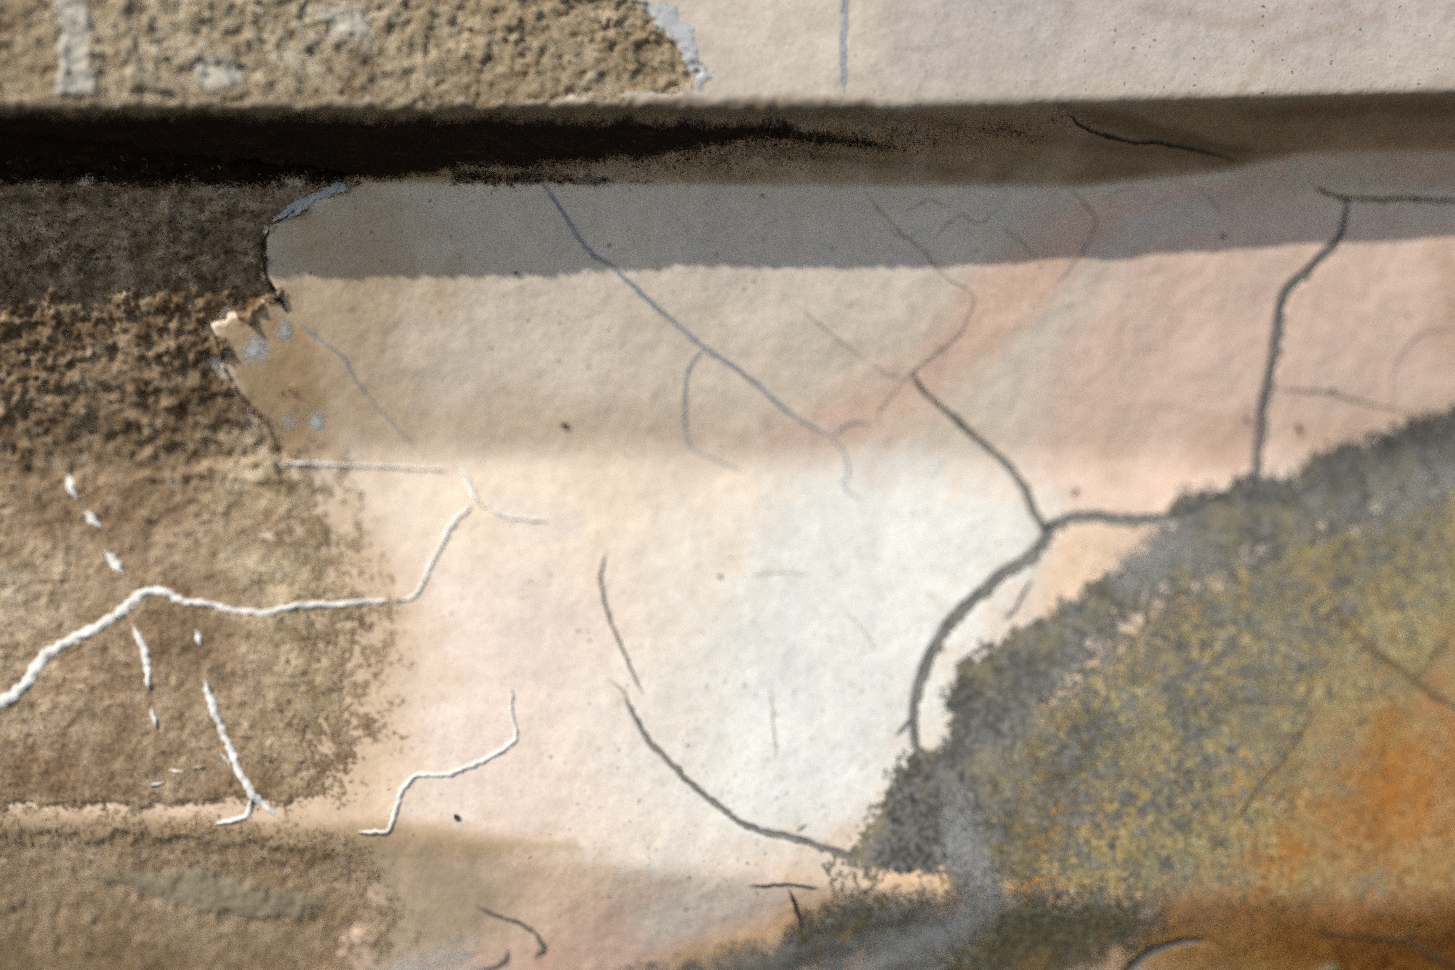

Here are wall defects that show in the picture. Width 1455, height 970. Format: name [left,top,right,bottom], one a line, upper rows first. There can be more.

flaking render [0,0,712,112]
crack [1068,114,1233,214]
crack [1253,187,1455,480]
crack [543,184,1186,765]
flaking render [0,158,486,970]
crack [599,554,856,859]
leakage [590,401,1455,970]
crack [1329,606,1455,710]
crack [1234,710,1315,823]
crack [747,883,820,932]
crack [1124,939,1205,970]
rust [1083,893,1455,970]